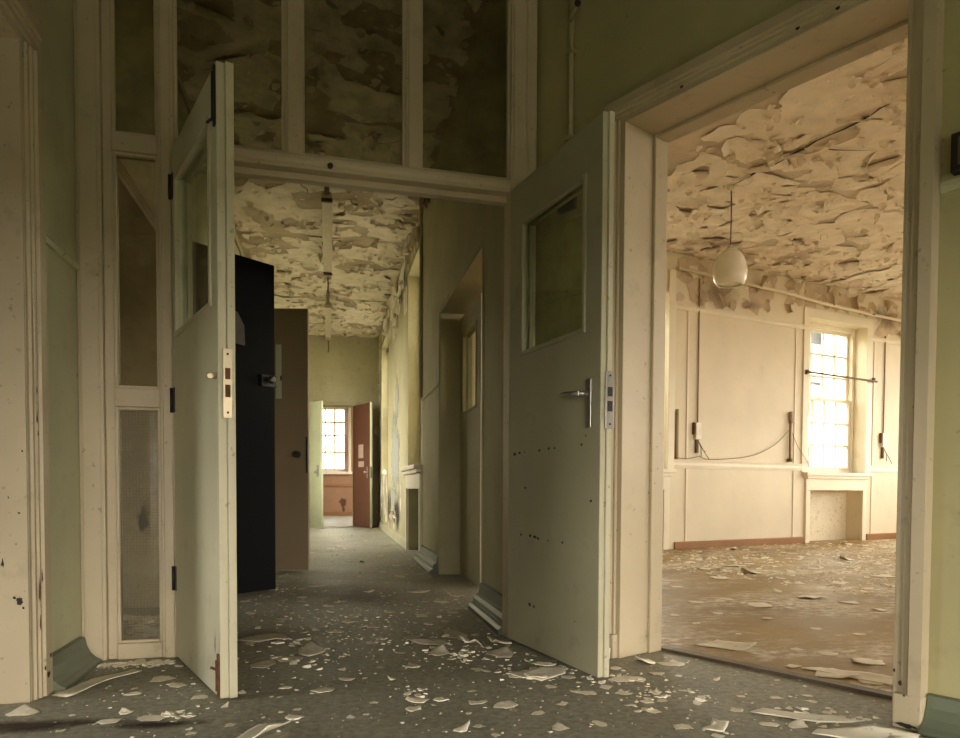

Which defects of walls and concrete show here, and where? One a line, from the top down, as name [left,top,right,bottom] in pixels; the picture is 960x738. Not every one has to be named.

peeling [177,0,282,151]
peeling [304,0,402,165]
peeling [423,0,482,168]
peeling [666,38,908,338]
crack [731,104,889,186]
peeling [234,177,430,529]